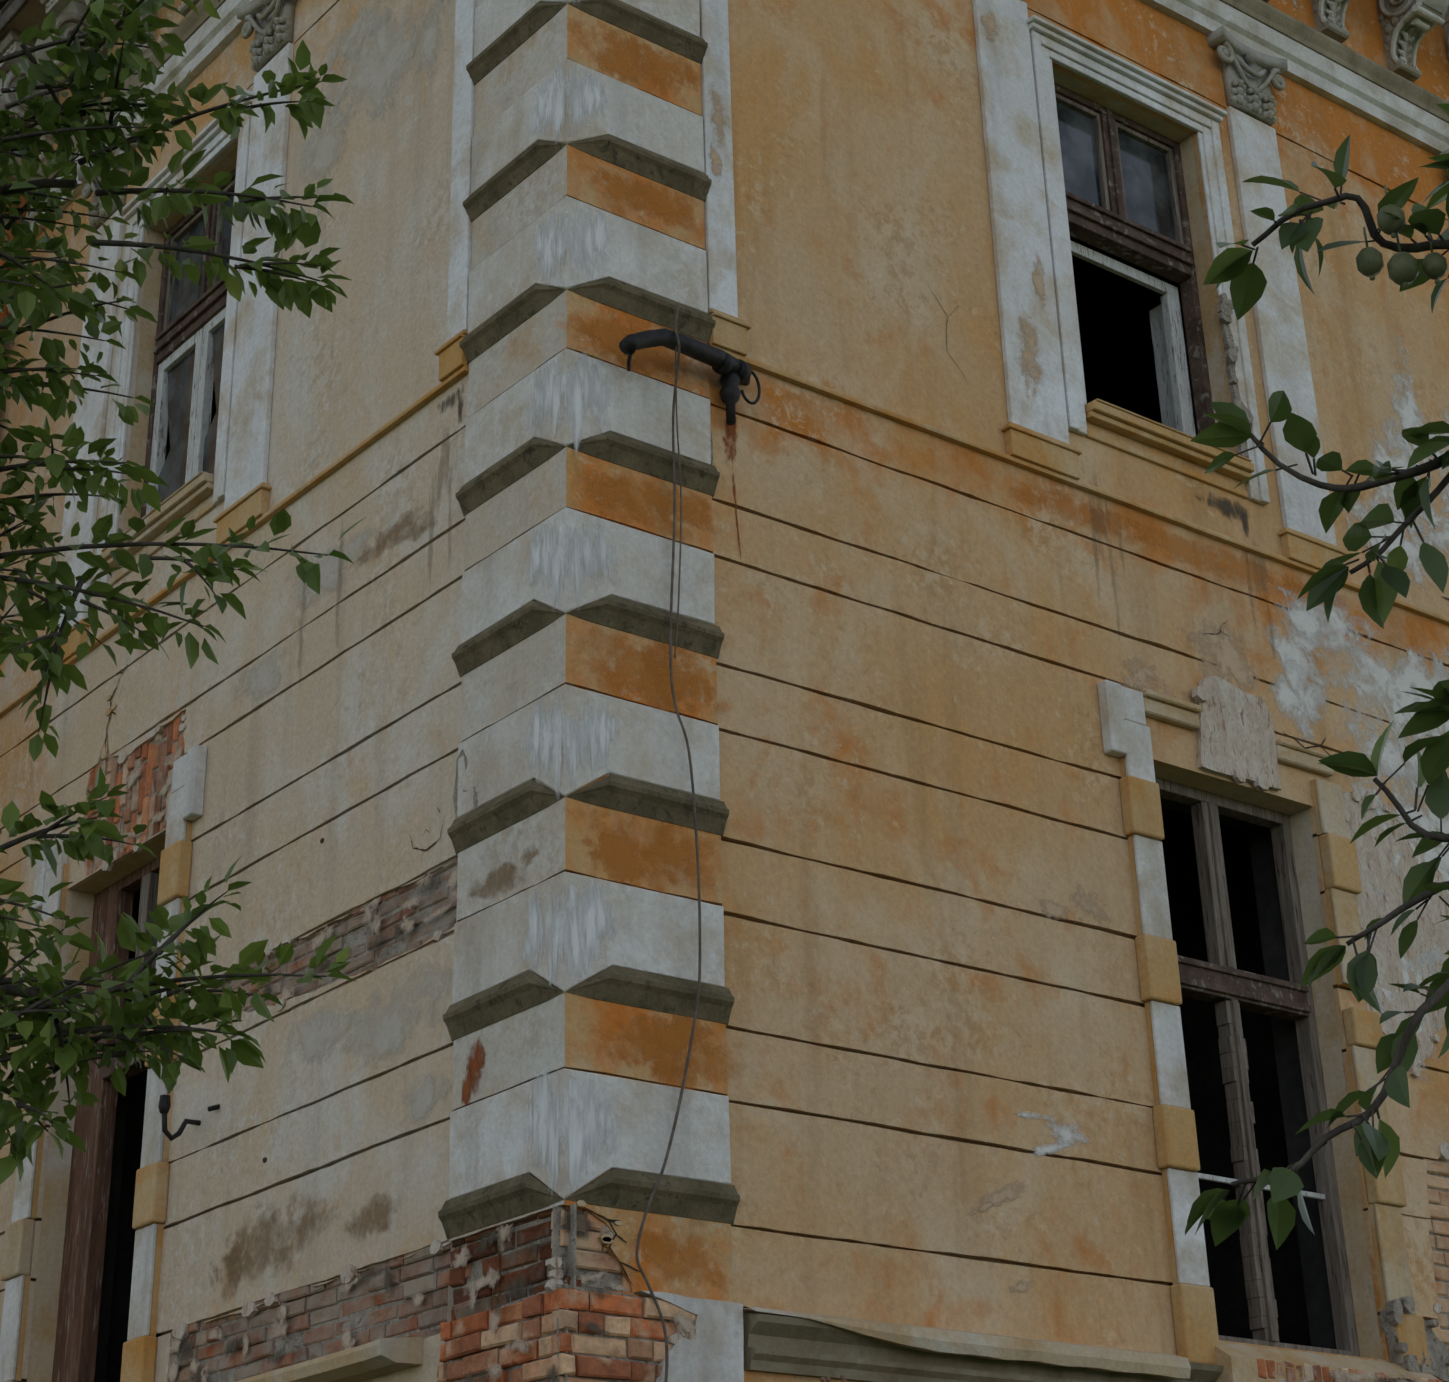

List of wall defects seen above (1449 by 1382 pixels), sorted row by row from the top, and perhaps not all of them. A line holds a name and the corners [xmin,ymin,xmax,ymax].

spalling [87,703,192,876]
flaking render [1192,588,1449,1077]
spalling [213,856,458,1019]
spalling [167,1204,701,1382]
spalling [1255,1142,1449,1382]